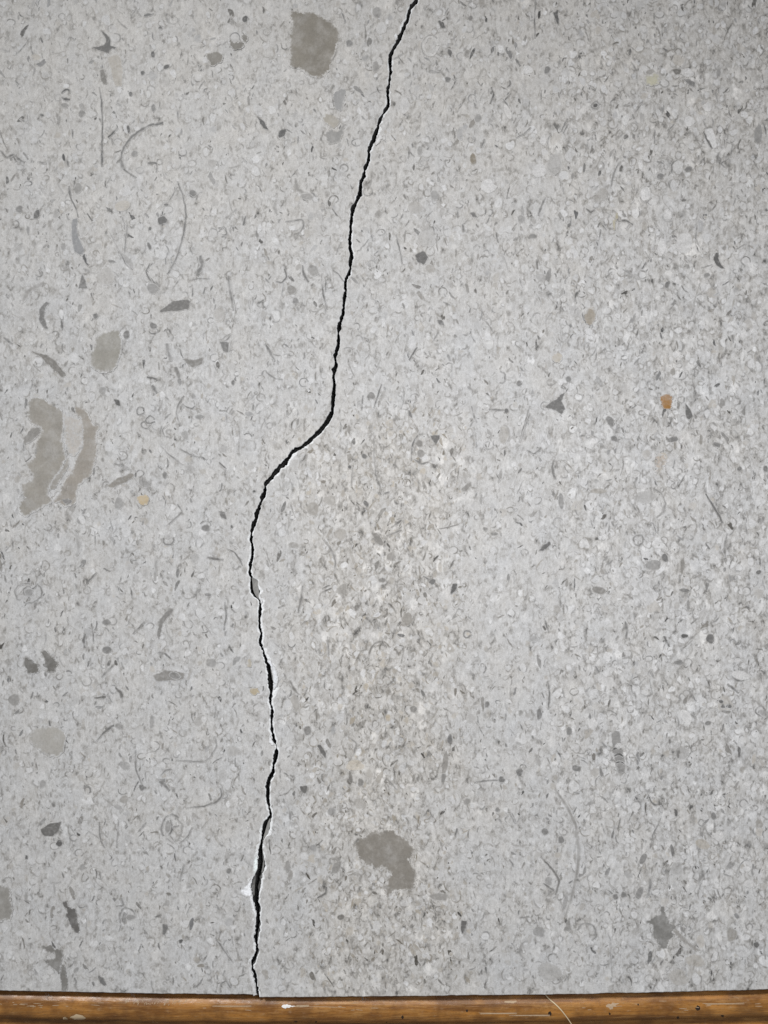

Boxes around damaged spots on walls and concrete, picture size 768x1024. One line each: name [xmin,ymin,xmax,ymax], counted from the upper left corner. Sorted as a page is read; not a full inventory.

crack [240,0,419,997]